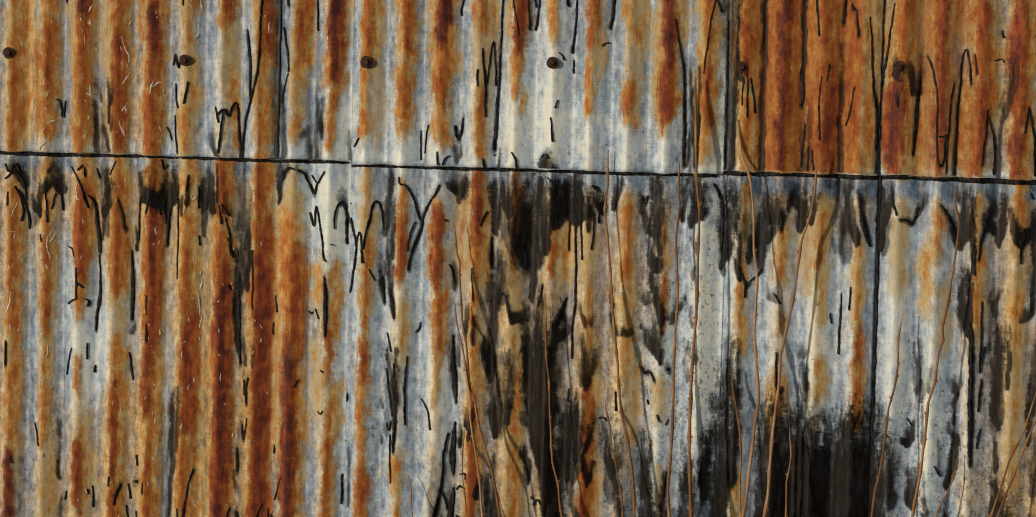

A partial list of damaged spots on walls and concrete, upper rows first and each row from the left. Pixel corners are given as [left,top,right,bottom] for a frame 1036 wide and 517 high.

rust [584,0,608,120]
rust [1,0,533,517]
leakage [356,200,384,263]
leakage [406,185,440,271]
rust [547,216,603,517]
leakage [568,211,600,359]
rust [619,193,668,448]
leakage [713,183,724,251]
leakage [739,268,762,298]
rust [620,0,1036,356]
rust [848,237,867,432]
leakage [967,322,985,467]